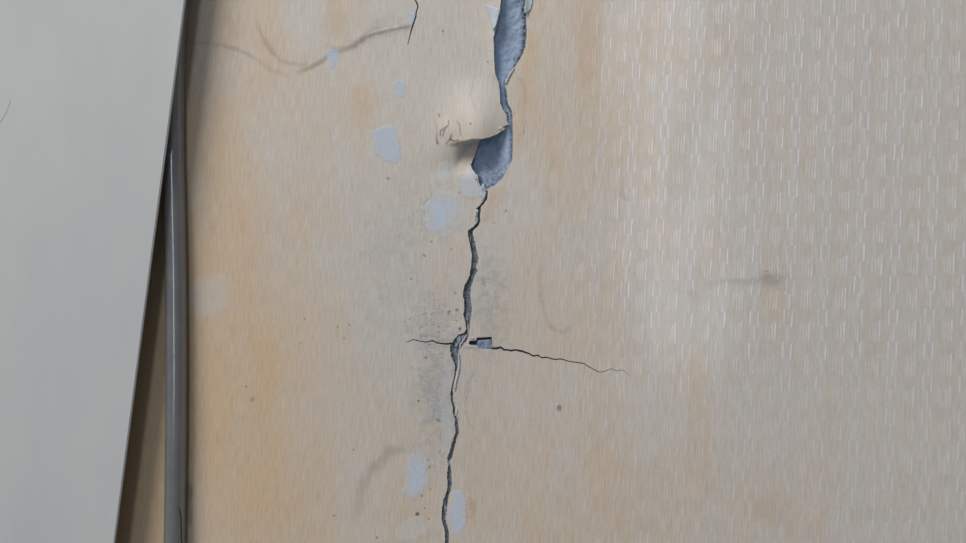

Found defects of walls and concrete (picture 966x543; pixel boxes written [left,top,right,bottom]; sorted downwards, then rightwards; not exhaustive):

crack [408,0,418,44]
flaking render [454,0,533,201]
peeling [371,123,403,165]
crack [407,190,630,543]
peeling [398,447,432,504]
peeling [446,488,467,538]